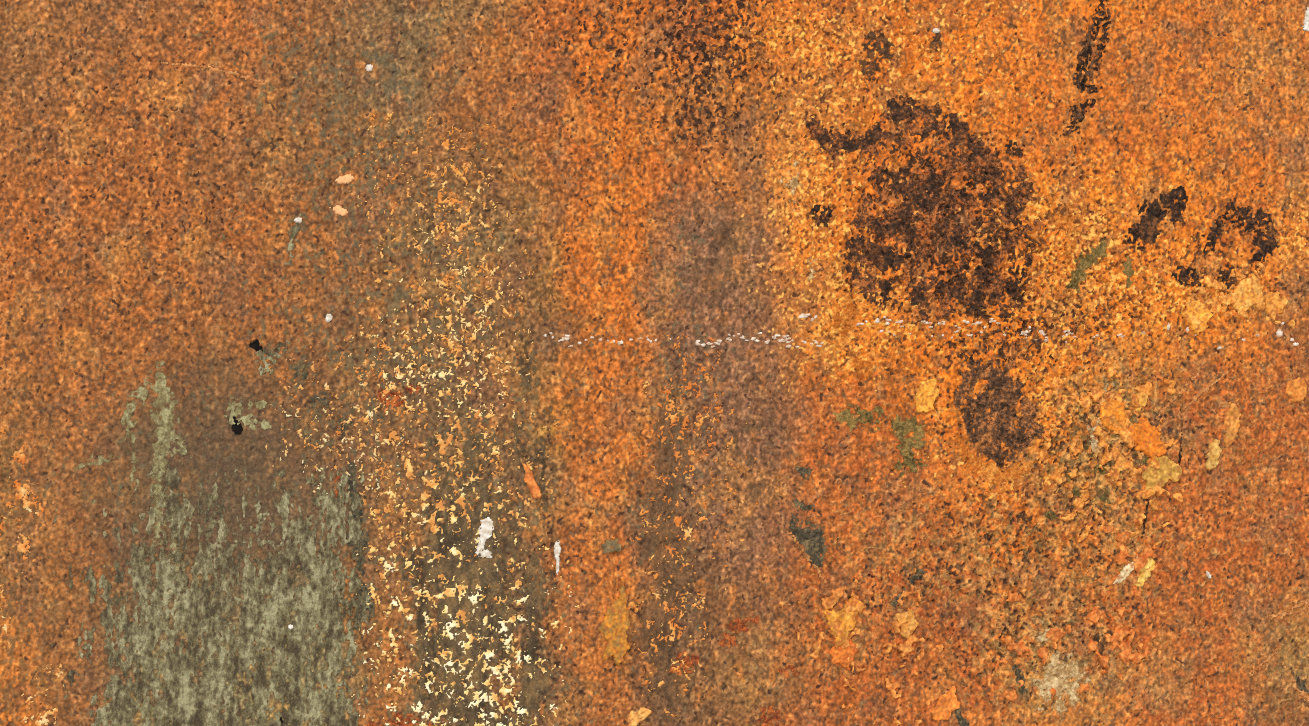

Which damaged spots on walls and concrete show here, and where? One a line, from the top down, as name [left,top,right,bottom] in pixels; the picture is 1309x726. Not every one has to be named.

corrosion [554,0,774,158]
corrosion [859,29,895,81]
water stain [780,161,802,203]
corrosion [1123,186,1296,336]
peeling [262,112,580,726]
corrosion [797,95,1183,702]
corrosion [1205,398,1241,470]
corrosion [522,463,541,499]
spalling [1087,449,1114,509]
spalling [890,568,925,607]
corrosion [627,707,652,726]
corrosion [893,685,961,726]